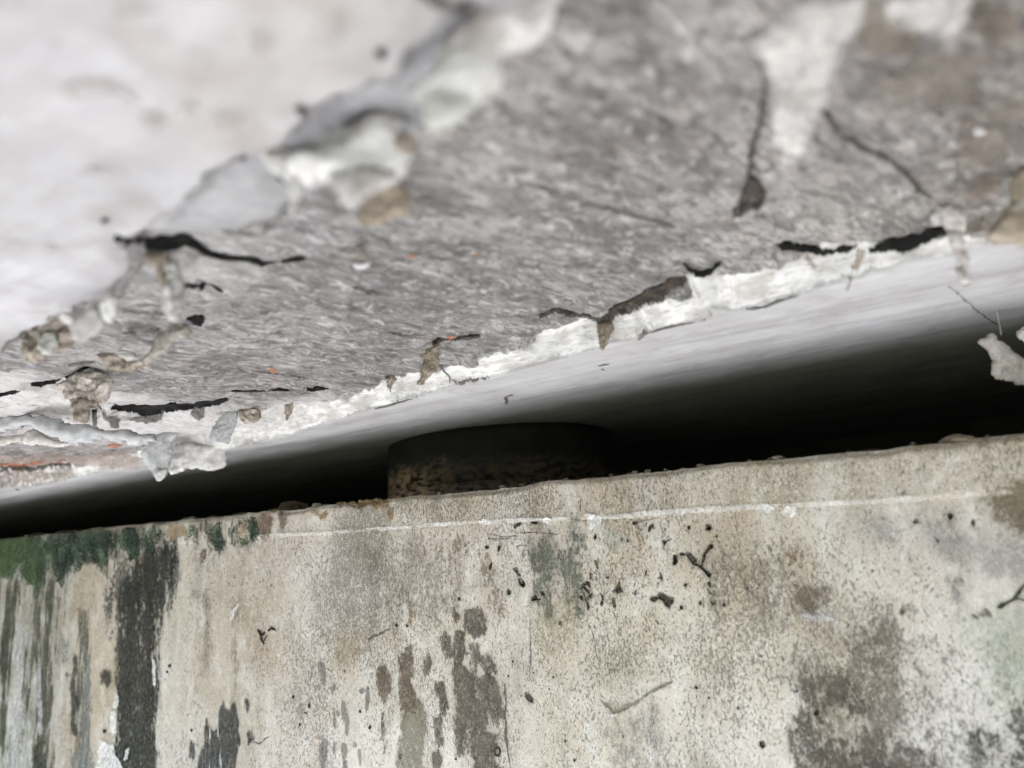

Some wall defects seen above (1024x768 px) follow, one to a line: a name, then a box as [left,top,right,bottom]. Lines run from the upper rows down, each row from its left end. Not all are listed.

crack [639,108,673,128]
crack [712,40,769,221]
crack [823,110,936,199]
spalling [0,0,1024,491]
damp [0,535,179,768]
damp [318,662,335,691]
damp [359,606,506,768]
damp [188,698,254,768]
damp [319,702,361,768]